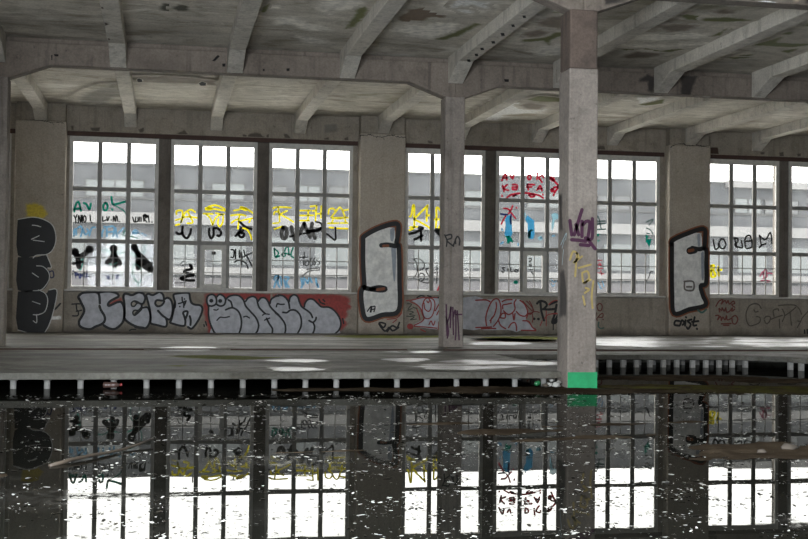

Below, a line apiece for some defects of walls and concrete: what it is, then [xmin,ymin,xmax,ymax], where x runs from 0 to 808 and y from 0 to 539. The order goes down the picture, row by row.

damp [260,0,377,47]
damp [381,0,510,42]